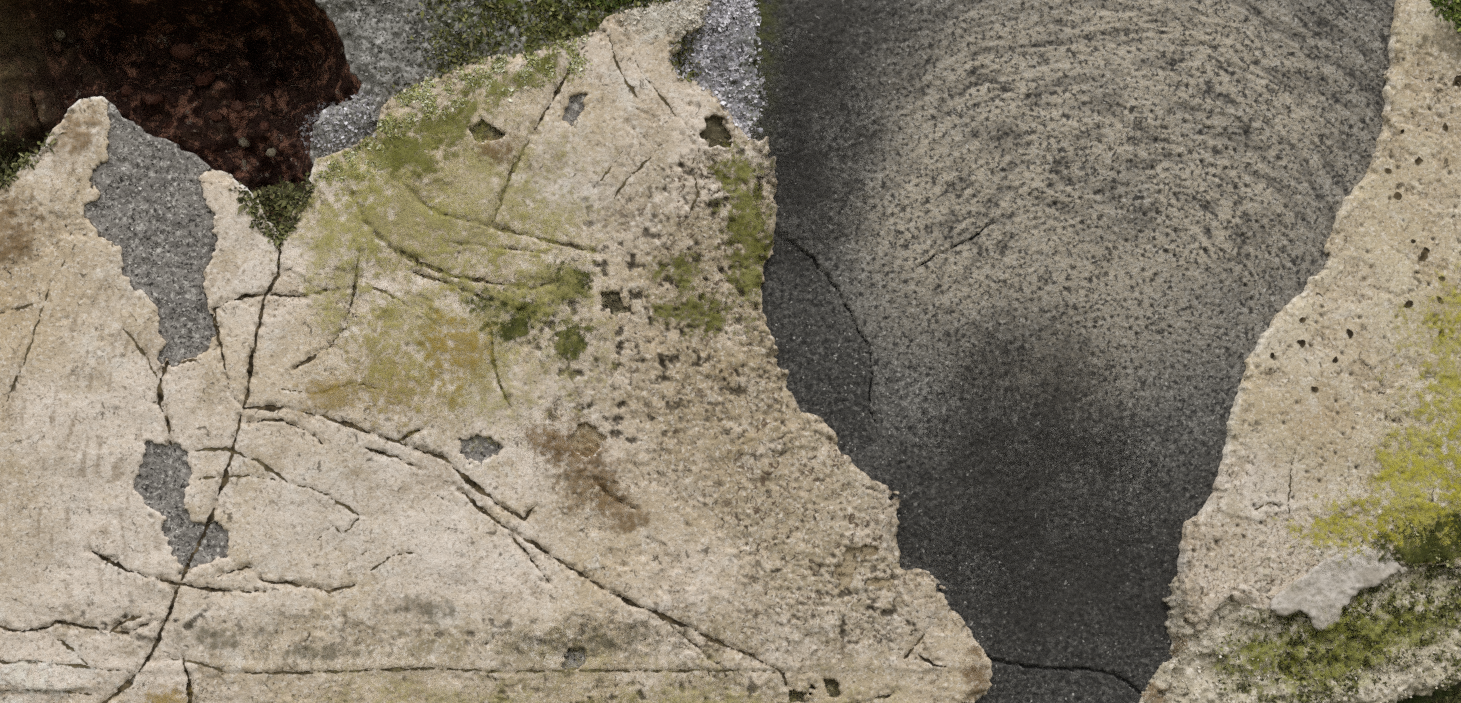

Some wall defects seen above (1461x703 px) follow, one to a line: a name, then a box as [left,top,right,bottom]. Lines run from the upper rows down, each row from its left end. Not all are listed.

spalling [0,0,362,367]
crack [0,38,787,703]
damp [299,129,592,410]
crack [793,243,876,422]
crack [921,224,991,265]
spalling [133,441,229,575]
crack [904,633,946,667]
crack [988,657,1142,694]
spalling [1139,538,1461,703]
damp [1377,532,1461,564]